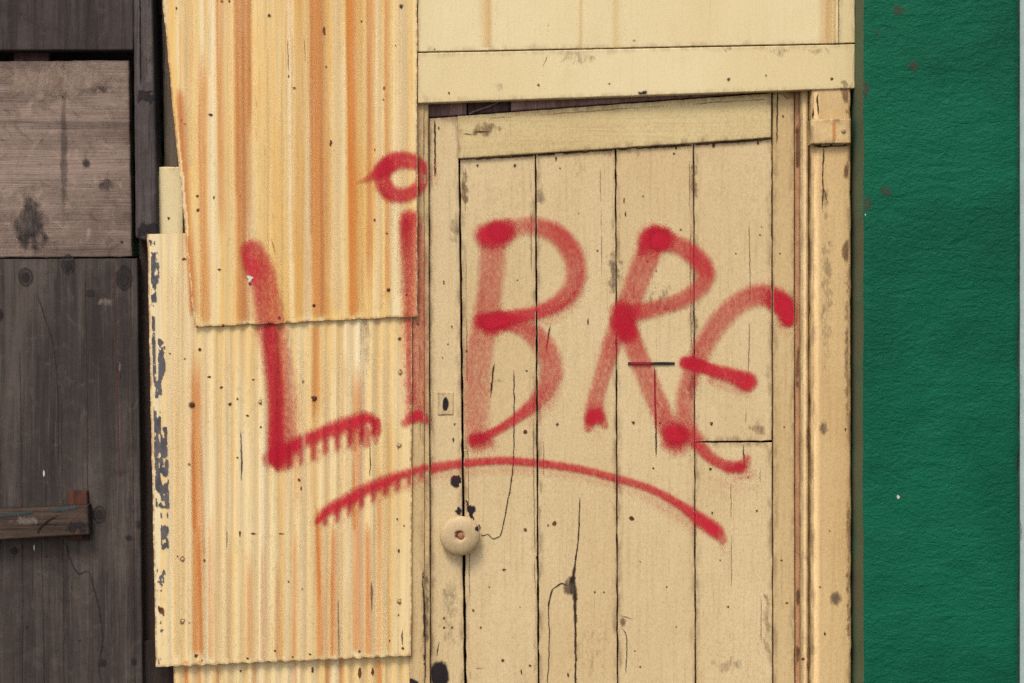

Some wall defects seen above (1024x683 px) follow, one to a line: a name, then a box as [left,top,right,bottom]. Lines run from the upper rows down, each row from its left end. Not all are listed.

leakage [15,200,46,249]
peeling [149,240,165,398]
rust [182,236,194,310]
rust [178,96,200,212]
rust [220,0,251,319]
rust [311,0,332,315]
rust [348,0,362,314]
peeling [154,411,169,549]
rust [177,391,205,587]
crack [465,366,544,539]
rust [309,535,334,672]
crack [534,501,580,683]